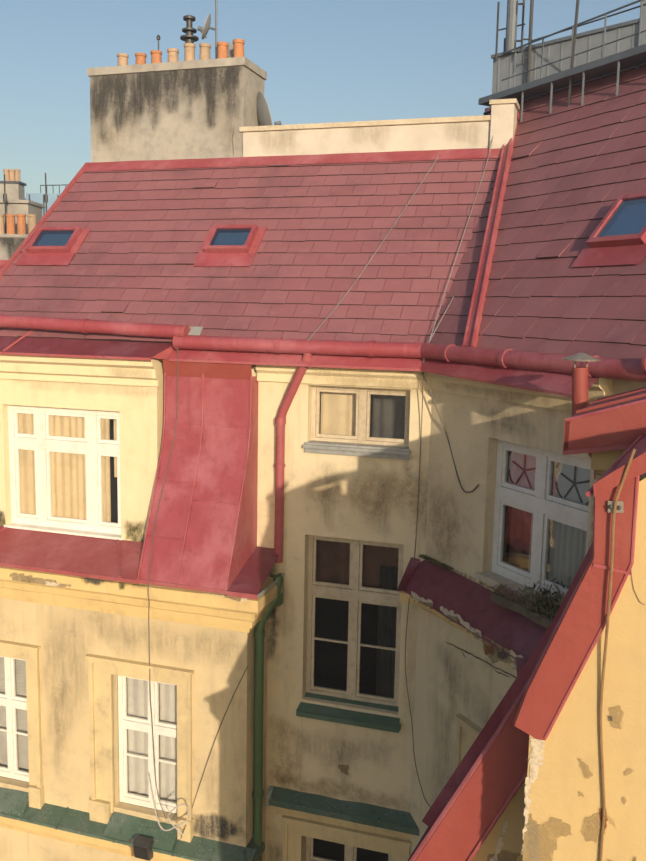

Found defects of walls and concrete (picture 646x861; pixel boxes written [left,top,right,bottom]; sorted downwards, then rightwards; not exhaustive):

water stain [97,74,125,127]
water stain [190,66,238,126]
spalling [411,591,523,665]
crack [446,642,516,678]
peeling [609,706,624,730]
peeling [578,759,593,779]
water stain [194,815,237,839]
peeling [487,814,572,861]
peeling [583,813,601,843]